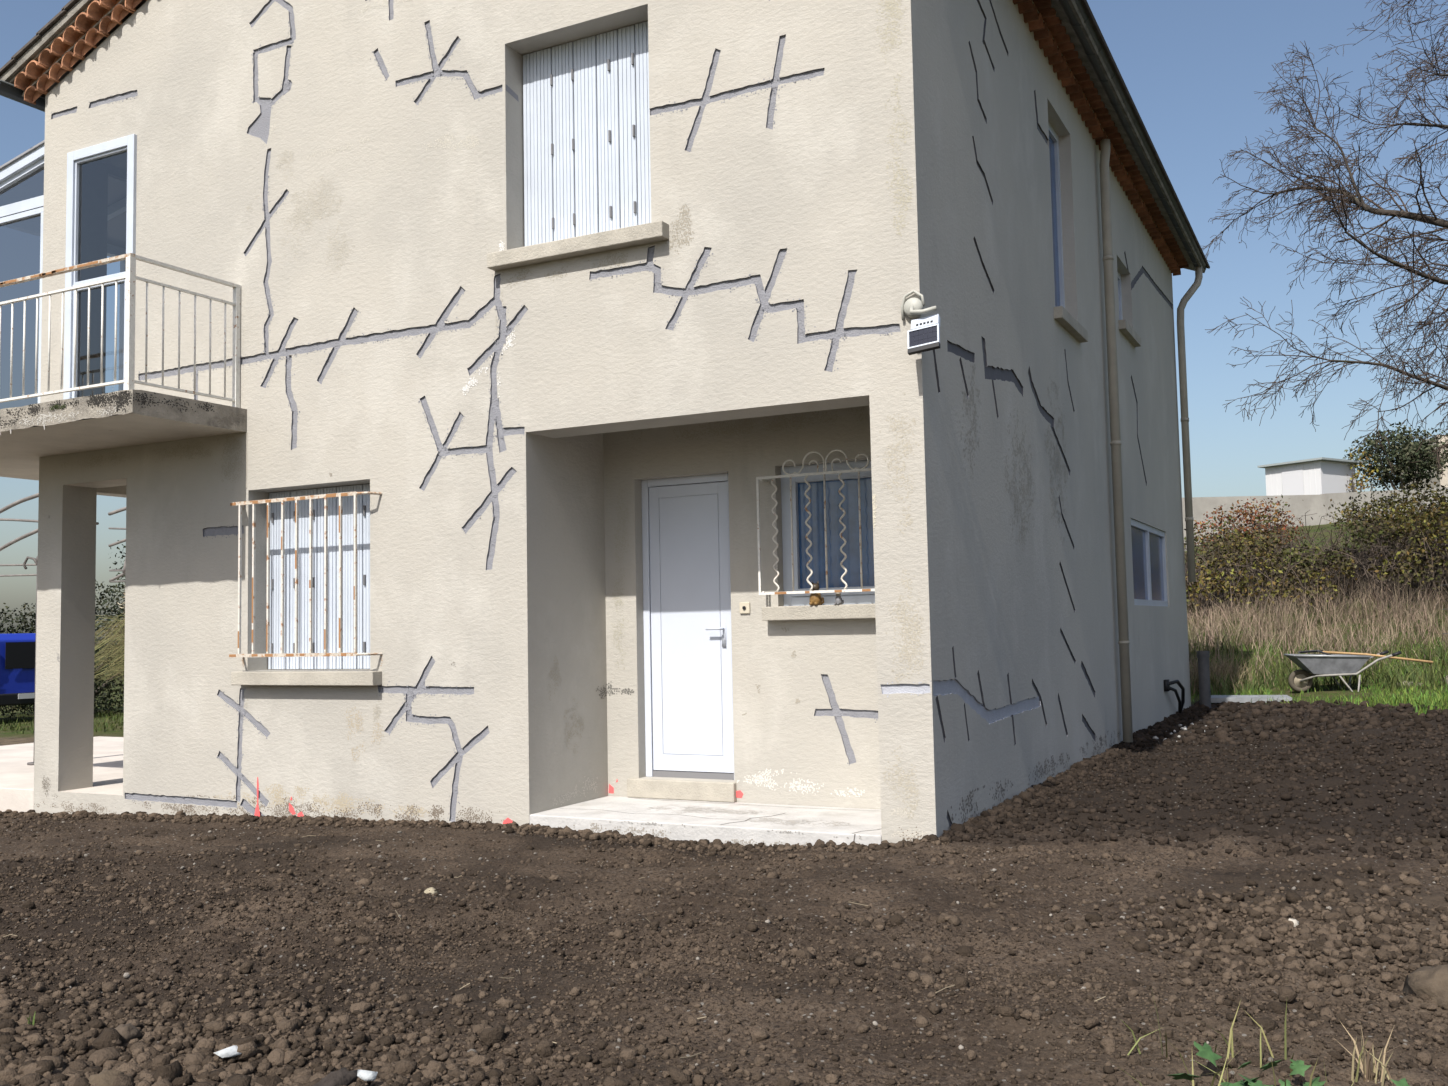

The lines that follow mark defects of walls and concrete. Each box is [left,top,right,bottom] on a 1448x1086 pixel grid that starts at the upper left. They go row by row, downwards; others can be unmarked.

crack [249,0,296,107]
crack [365,0,519,105]
crack [650,34,825,152]
damp [0,390,214,428]
crack [138,148,528,570]
crack [589,245,901,372]
rust [230,496,305,569]
crack [814,337,1096,764]
rust [229,577,304,667]
rust [324,618,346,656]
crack [124,688,270,816]
crack [378,656,490,822]